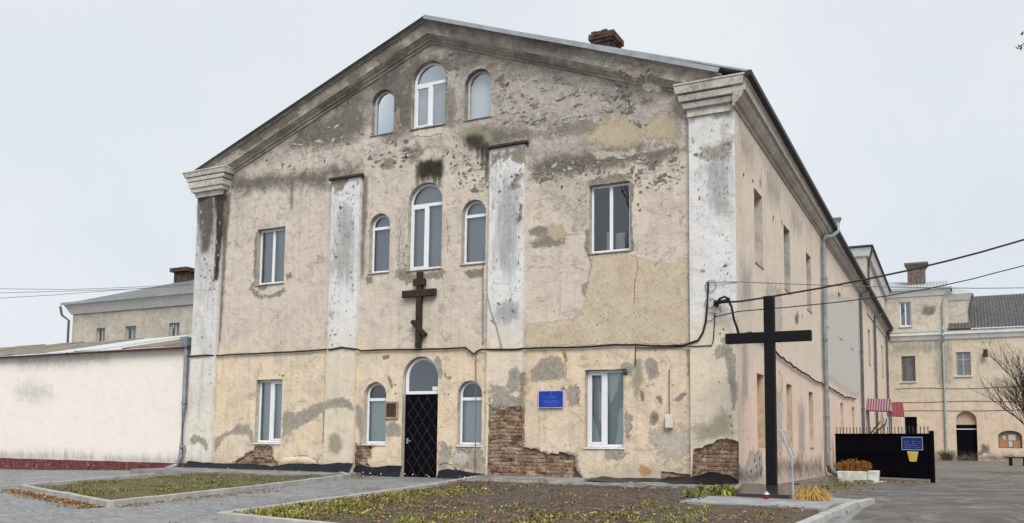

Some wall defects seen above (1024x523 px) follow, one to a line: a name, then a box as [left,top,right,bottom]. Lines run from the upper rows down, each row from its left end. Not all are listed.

leakage [417,159,442,184]
peeling [442,60,732,324]
leakage [197,167,367,334]
spalling [235,444,278,466]
spalling [354,442,376,468]
spalling [437,372,583,478]
spalling [661,406,764,483]